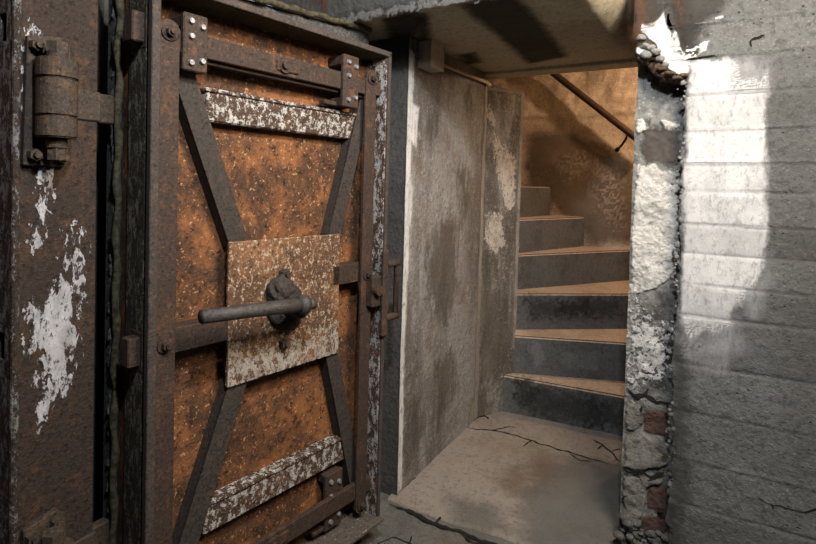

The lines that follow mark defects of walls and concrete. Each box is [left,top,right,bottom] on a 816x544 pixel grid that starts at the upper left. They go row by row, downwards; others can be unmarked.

spalling [343,0,465,23]
peeling [634,12,709,108]
peeling [25,166,56,256]
peeling [20,220,91,435]
spalling [622,118,688,532]
crack [467,415,664,481]
crack [759,498,816,513]